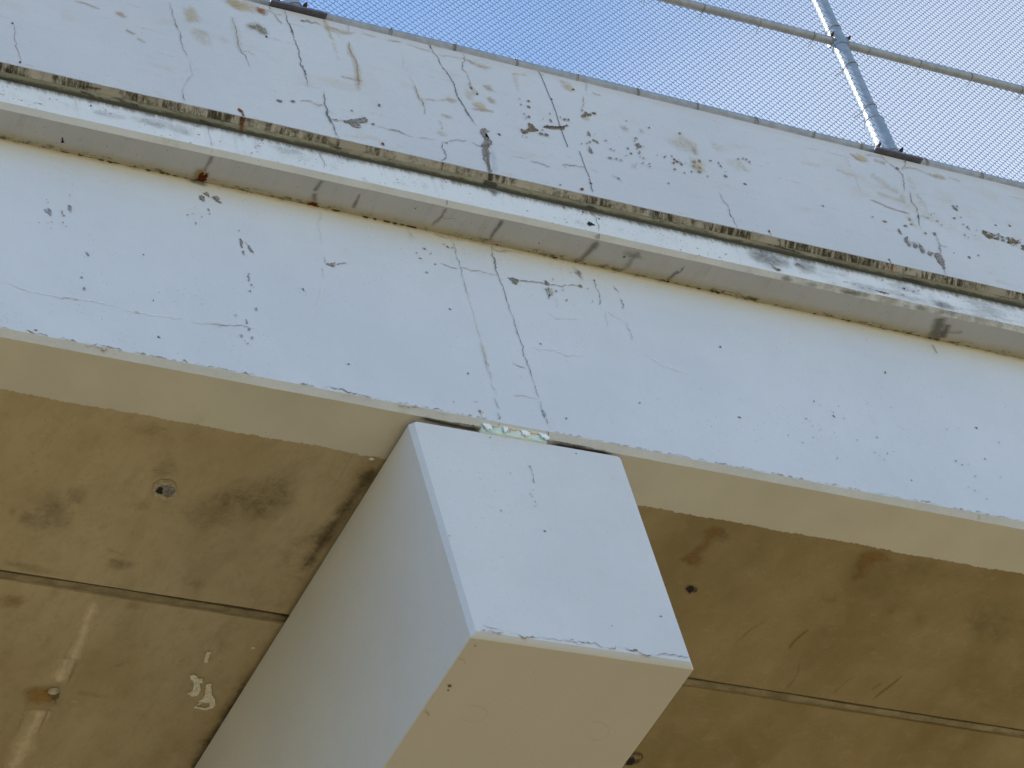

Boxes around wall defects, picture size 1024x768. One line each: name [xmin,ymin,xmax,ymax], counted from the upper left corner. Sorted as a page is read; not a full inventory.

peeling [344,110,375,128]
rust [190,170,208,185]
crack [275,13,484,312]
spalling [481,128,501,172]
crack [870,154,930,225]
peeling [952,205,1024,249]
crack [408,209,581,435]